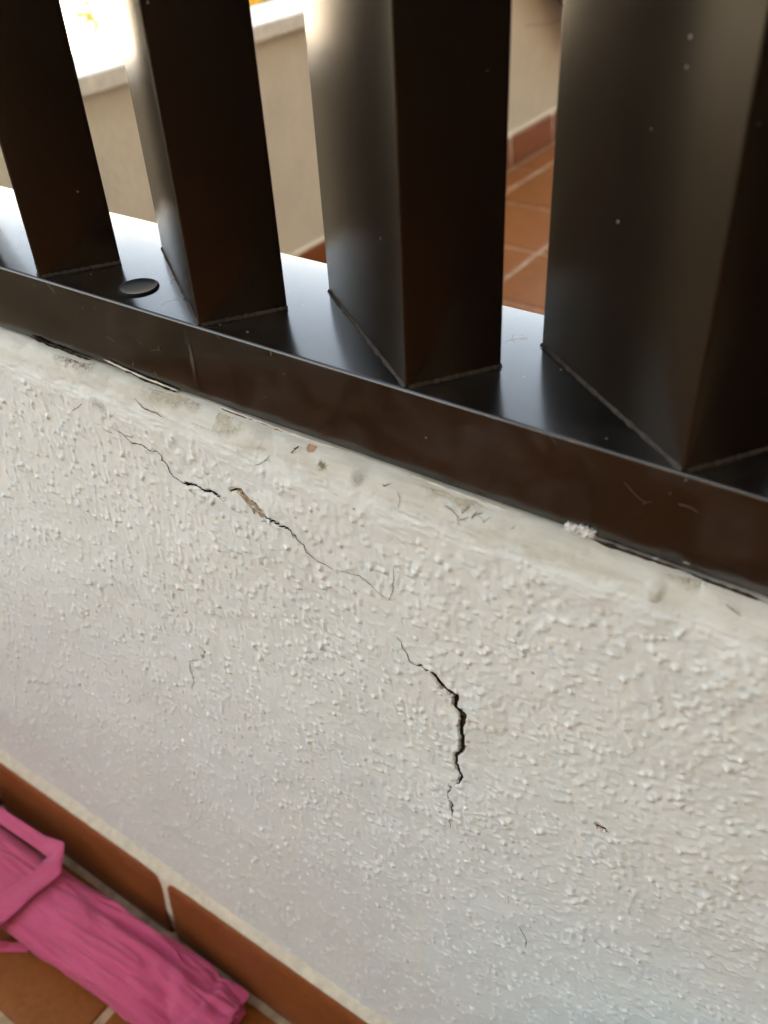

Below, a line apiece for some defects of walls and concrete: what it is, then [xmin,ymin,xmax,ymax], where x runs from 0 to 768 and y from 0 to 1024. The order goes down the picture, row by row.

crack [104,429,394,599]
crack [396,637,472,827]